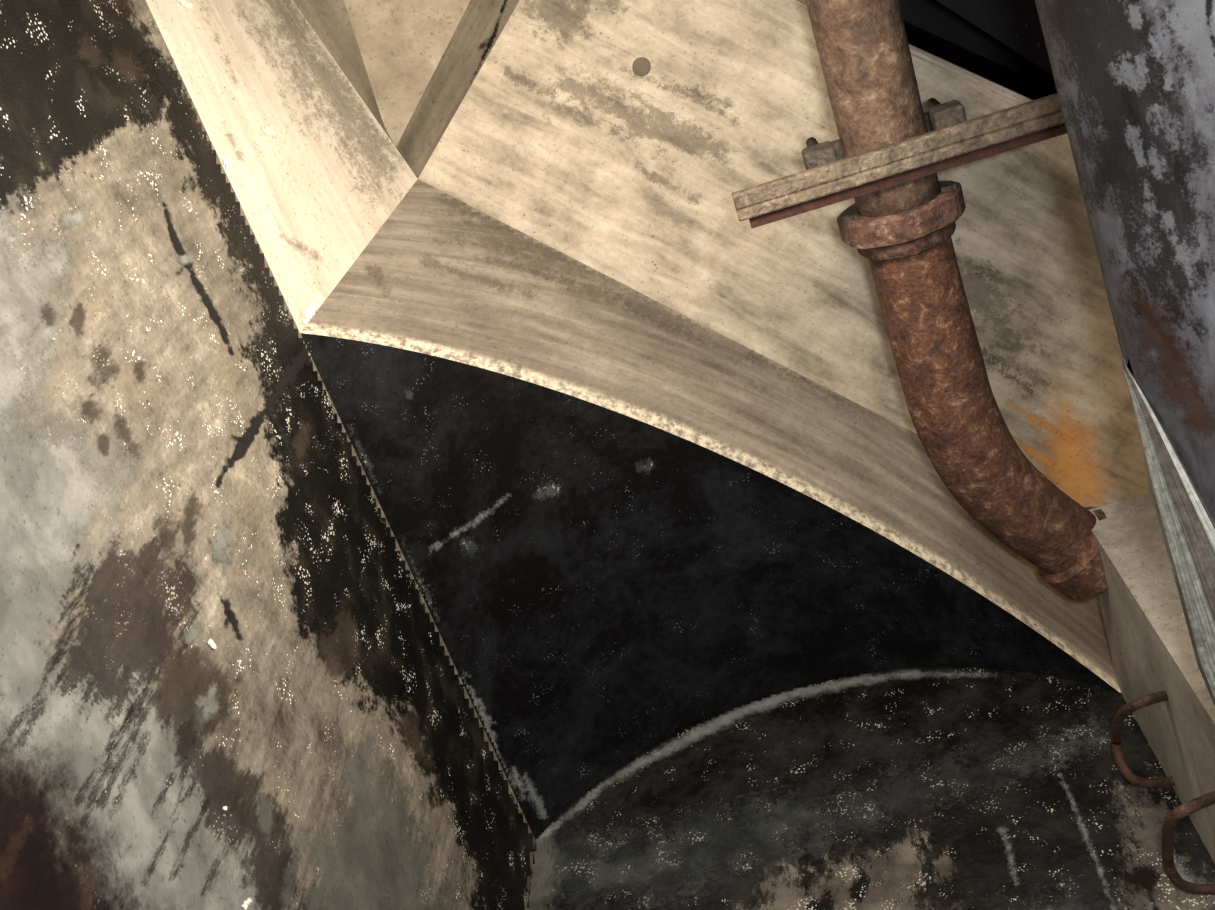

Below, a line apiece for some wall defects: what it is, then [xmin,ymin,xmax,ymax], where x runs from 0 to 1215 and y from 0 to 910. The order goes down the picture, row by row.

crack [163,202,234,355]
crack [216,341,312,488]
corrosion [1014,405,1103,507]
corrosion [1119,289,1215,433]
water stain [0,191,276,910]
water stain [291,736,462,910]
corrosion [1126,867,1160,910]